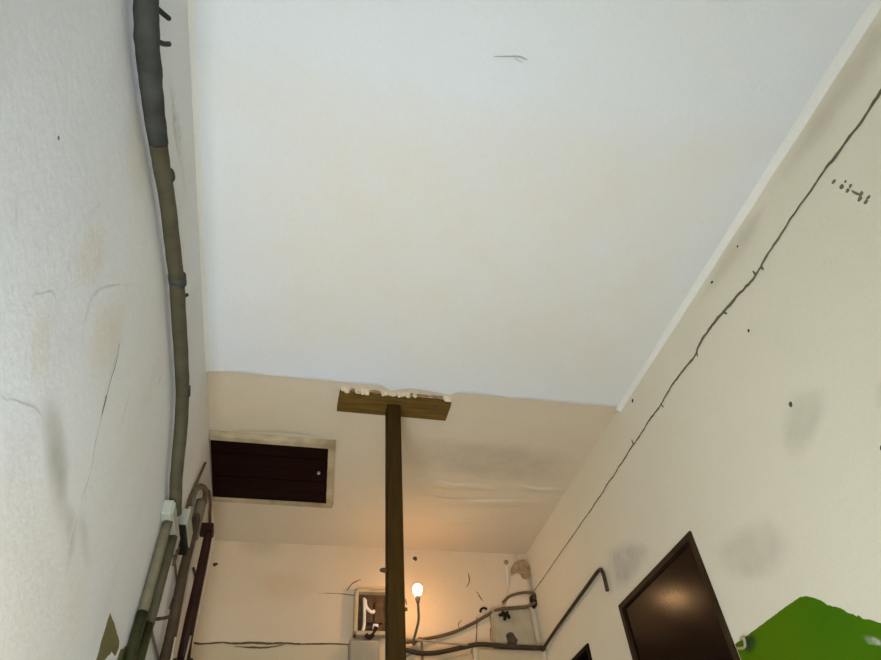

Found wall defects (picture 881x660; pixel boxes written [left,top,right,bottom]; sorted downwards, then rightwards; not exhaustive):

crack [534,89,881,591]
crack [68,344,120,548]
peeling [96,614,127,660]